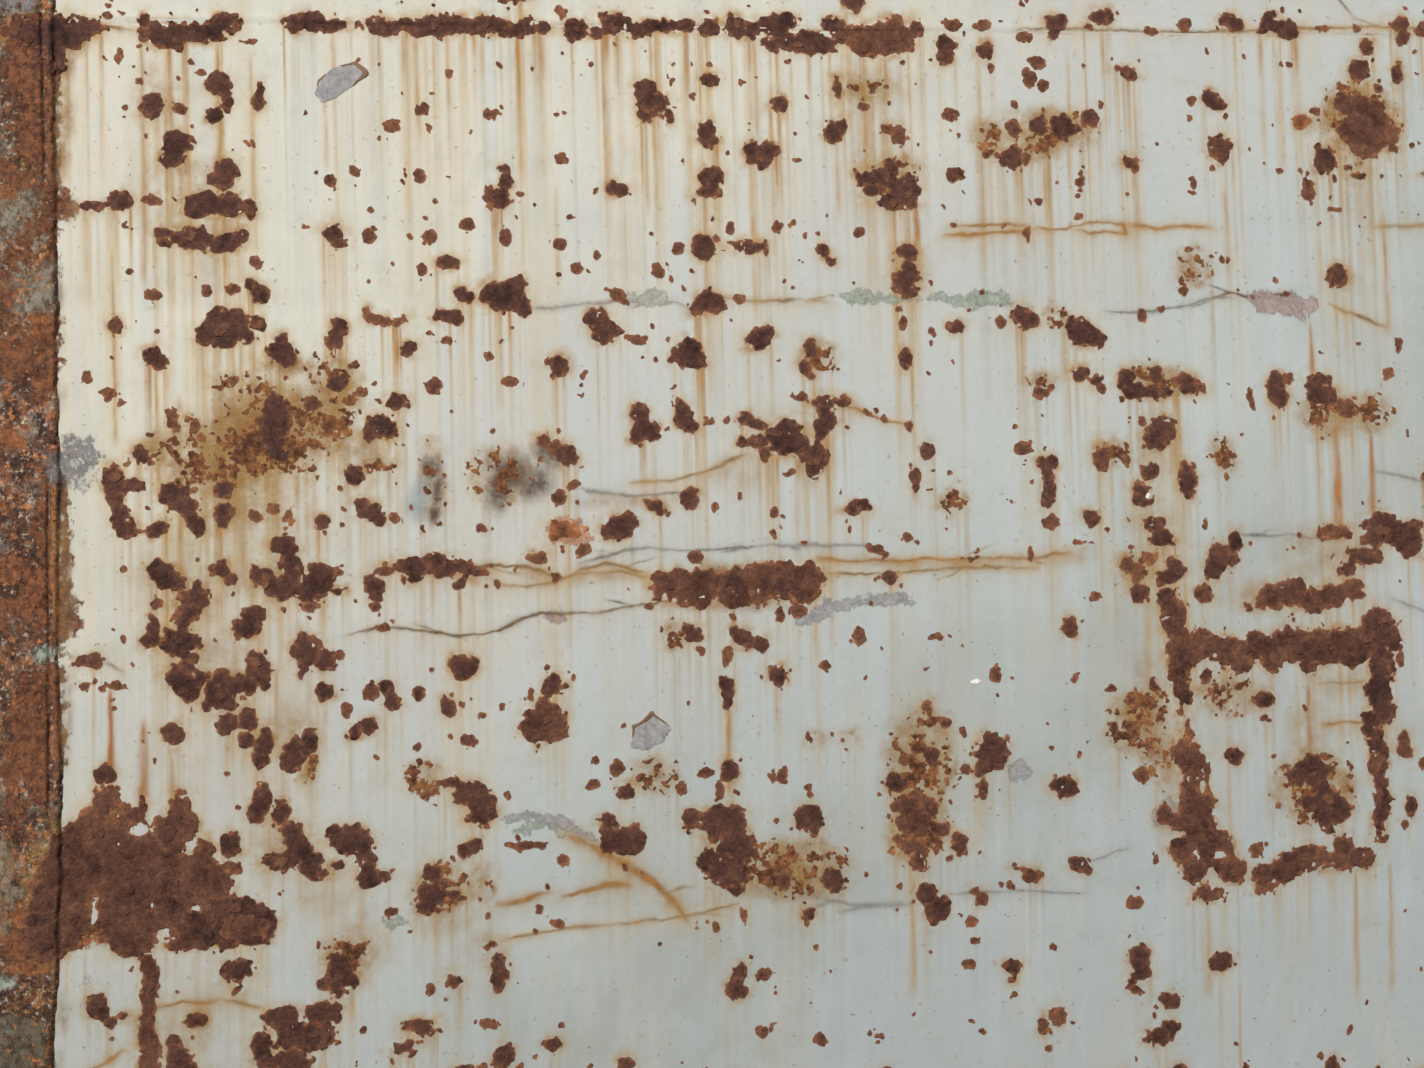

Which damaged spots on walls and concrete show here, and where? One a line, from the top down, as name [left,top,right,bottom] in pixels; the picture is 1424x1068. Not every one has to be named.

peeling [315,61,368,102]
corrosion [977,8,1119,220]
corrosion [1263,6,1424,226]
corrosion [582,214,968,533]
corrosion [853,124,933,376]
corrosion [995,304,1108,349]
corrosion [0,0,720,1068]
peeling [631,711,671,750]
corrosion [585,541,869,927]
corrosion [877,700,1044,971]
corrosion [1068,334,1424,905]
corrosion [1125,934,1184,1062]